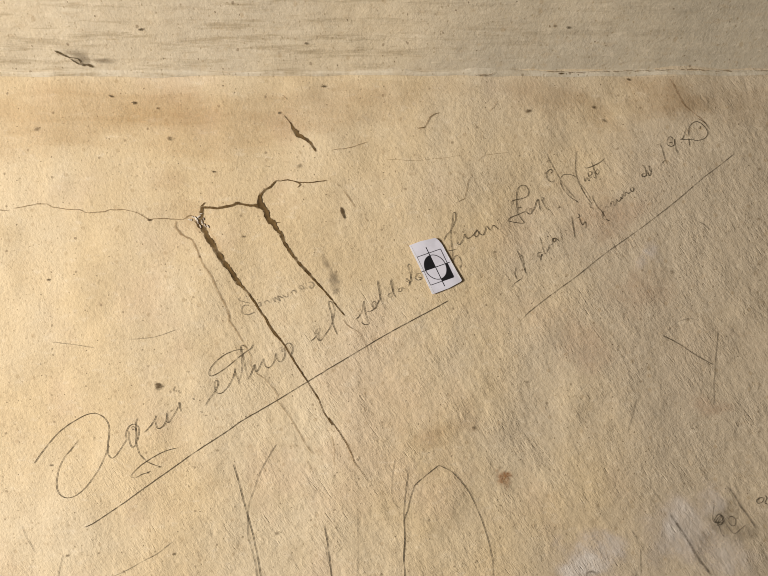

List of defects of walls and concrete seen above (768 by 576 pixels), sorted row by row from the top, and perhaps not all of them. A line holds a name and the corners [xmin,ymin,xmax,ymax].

crack [285,117,316,151]
crack [4,179,367,480]